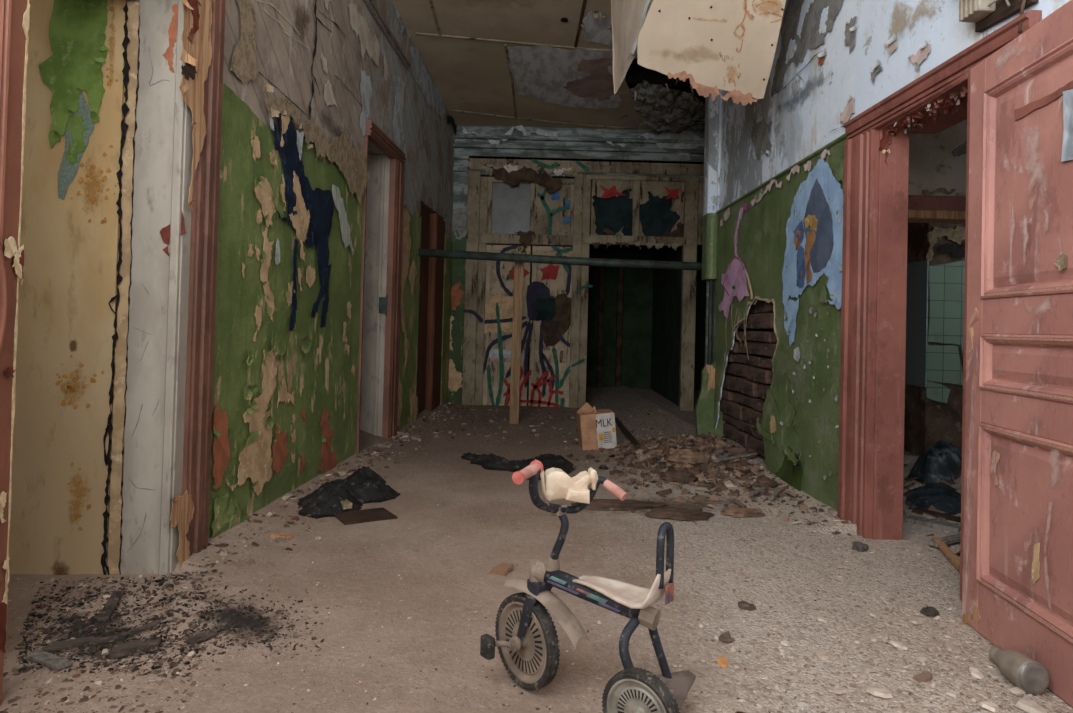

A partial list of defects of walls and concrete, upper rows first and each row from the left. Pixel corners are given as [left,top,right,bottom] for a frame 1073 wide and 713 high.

peeling [771,0,857,98]
peeling [870,34,897,83]
peeling [908,40,931,70]
peeling [751,118,772,161]
peeling [839,95,855,126]
peeling [878,86,968,162]
peeling [750,149,830,205]
peeling [212,0,407,496]
peeling [926,225,965,261]
flaking render [704,296,838,460]
peeling [774,446,838,491]